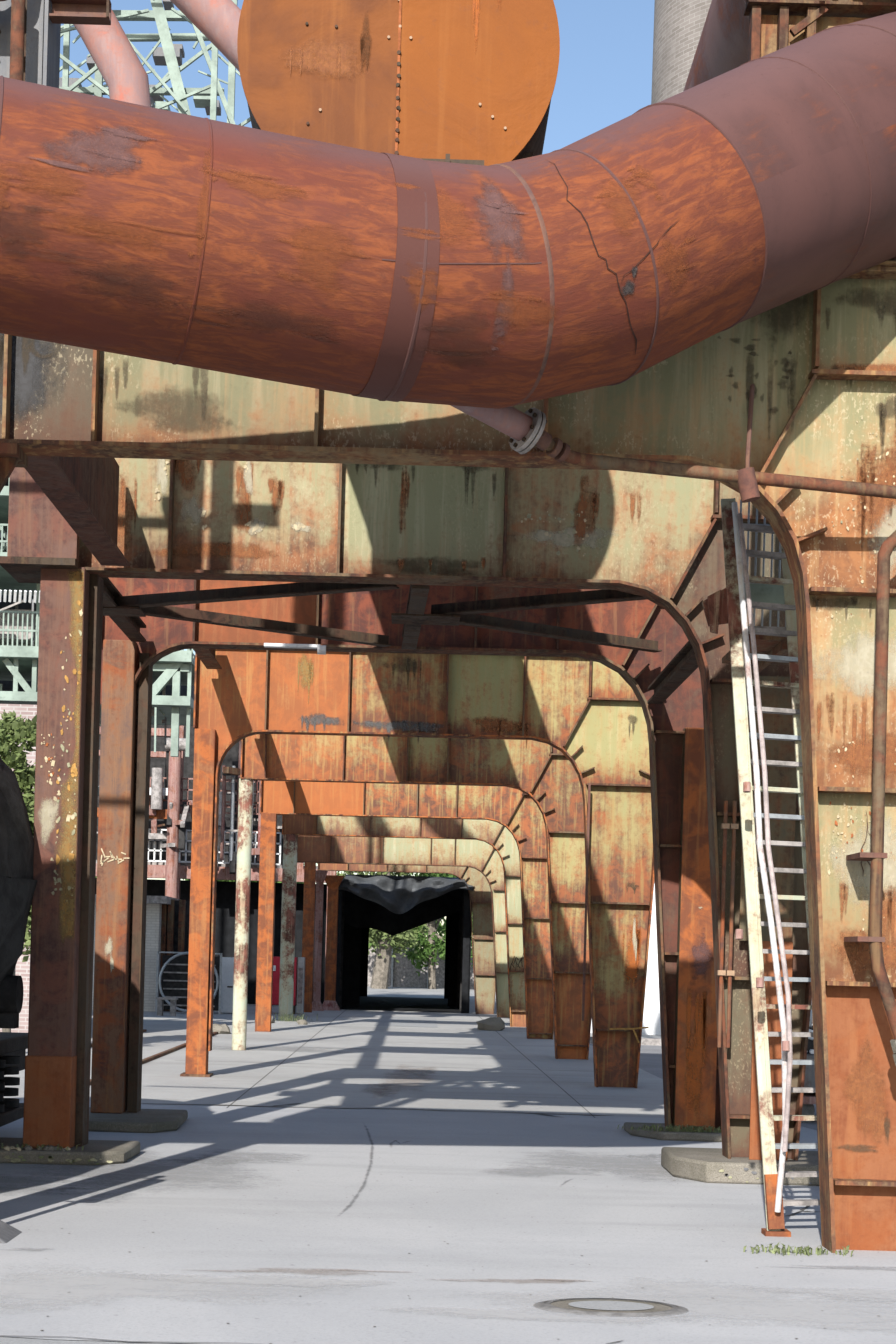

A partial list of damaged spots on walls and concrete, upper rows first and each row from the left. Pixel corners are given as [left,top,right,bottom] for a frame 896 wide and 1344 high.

damp [30,126,156,171]
rust [0,77,765,409]
crack [547,160,677,354]
damp [0,333,49,418]
rust [153,459,284,558]
rust [399,472,410,530]
rust [857,441,896,552]